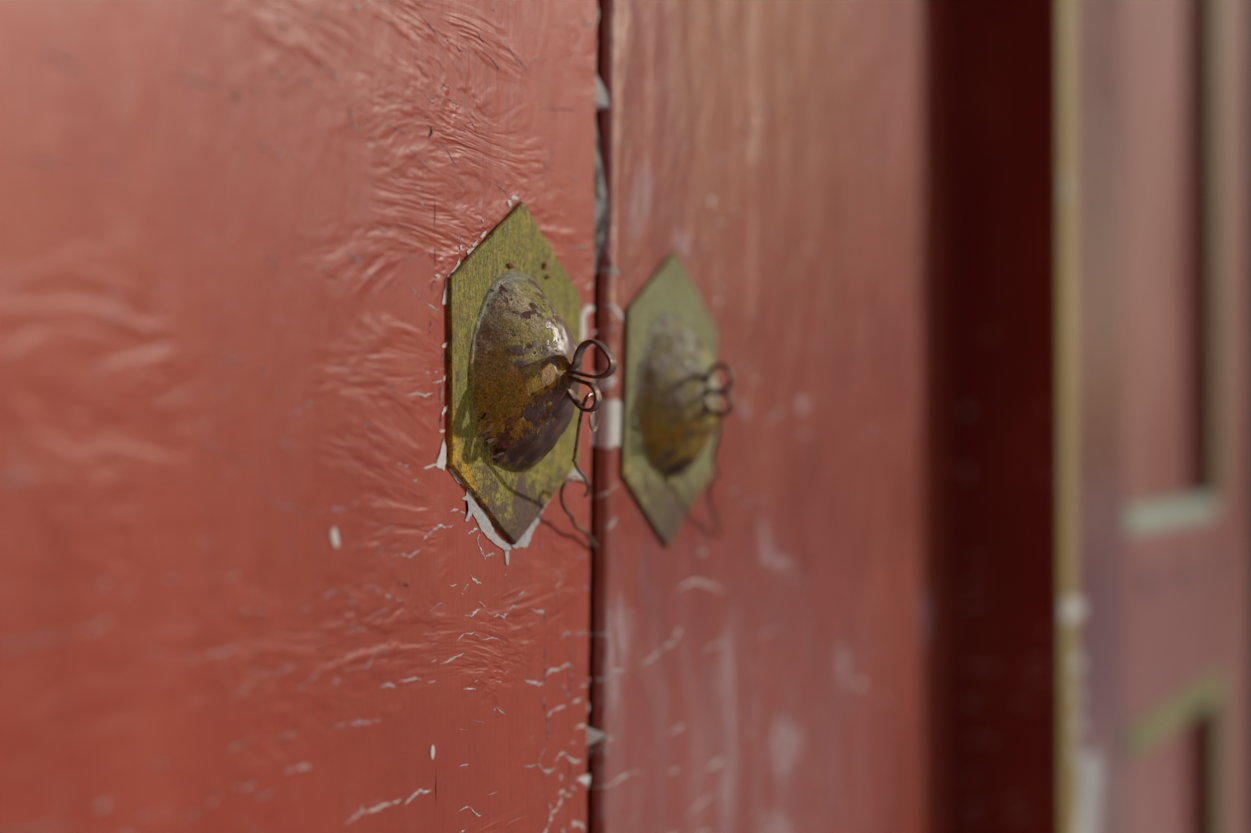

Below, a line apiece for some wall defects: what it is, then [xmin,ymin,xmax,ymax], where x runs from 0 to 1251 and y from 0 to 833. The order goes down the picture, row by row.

peeling [585,75,619,289]
peeling [434,219,487,305]
peeling [580,303,623,346]
peeling [422,405,550,565]
peeling [330,528,339,548]
peeling [587,728,613,757]